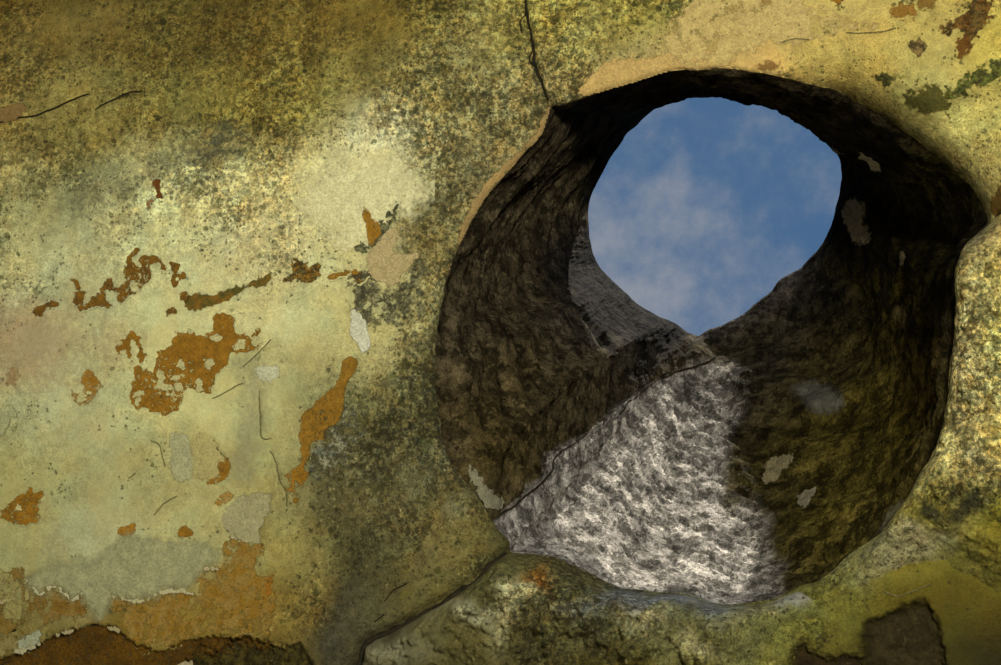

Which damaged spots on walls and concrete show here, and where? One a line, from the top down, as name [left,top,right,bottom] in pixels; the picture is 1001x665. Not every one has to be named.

crack [520,0,549,102]
rust [932,0,995,59]
crack [0,91,143,123]
peeling [0,523,315,665]
crack [374,582,409,622]